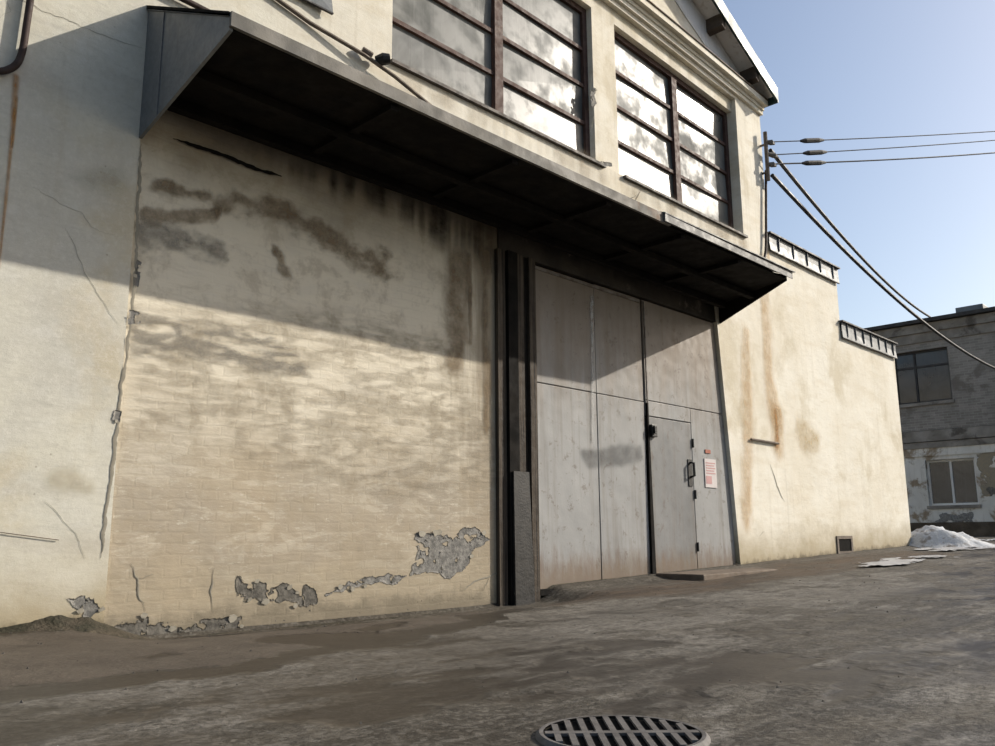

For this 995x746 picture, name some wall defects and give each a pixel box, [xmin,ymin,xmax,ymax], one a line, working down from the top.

corrosion [7,76,18,179]
crack [173,138,282,177]
damp [139,180,388,278]
crack [36,146,142,556]
damp [448,251,490,431]
spalling [977,452,995,496]
spalling [68,595,105,618]
crack [131,564,153,608]
spalling [115,613,244,636]
spalling [236,527,490,608]